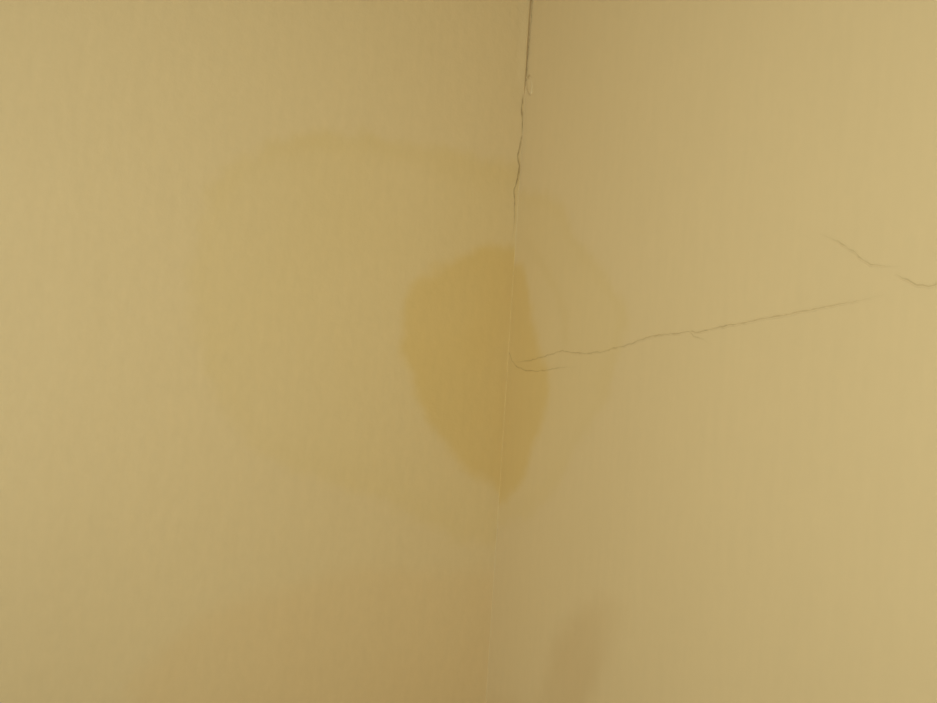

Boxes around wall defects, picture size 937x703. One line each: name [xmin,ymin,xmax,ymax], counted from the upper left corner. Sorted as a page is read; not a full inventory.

leakage [115,121,637,703]
crack [509,233,937,373]